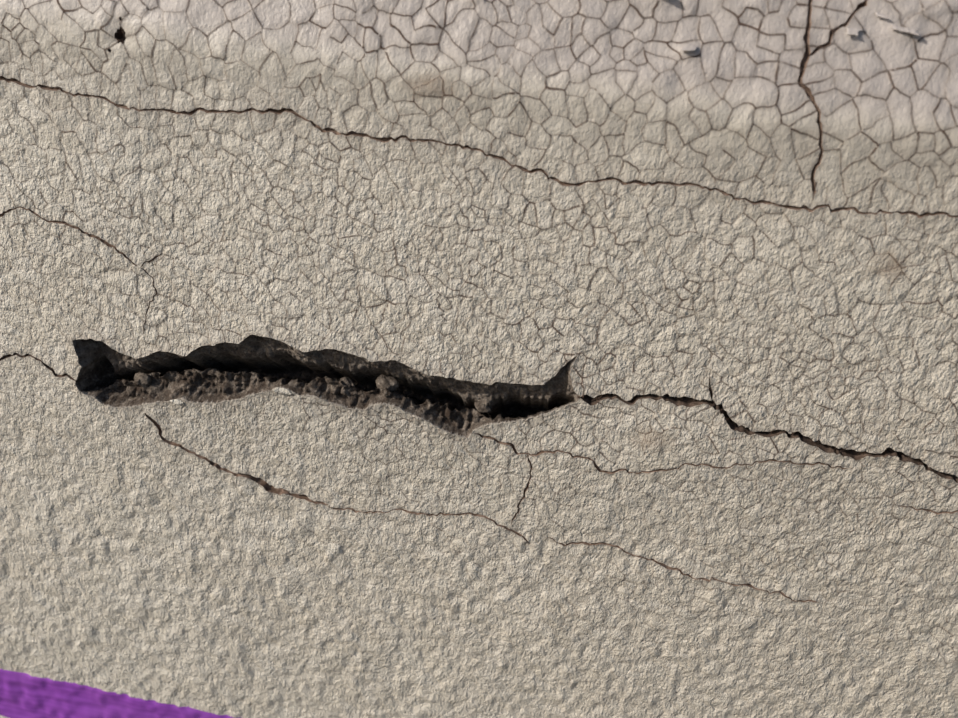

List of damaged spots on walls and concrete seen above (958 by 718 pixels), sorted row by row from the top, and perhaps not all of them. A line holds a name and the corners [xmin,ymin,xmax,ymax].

crack [0,0,958,345]
crack [0,353,77,382]
spalling [72,335,580,438]
crack [145,291,958,603]